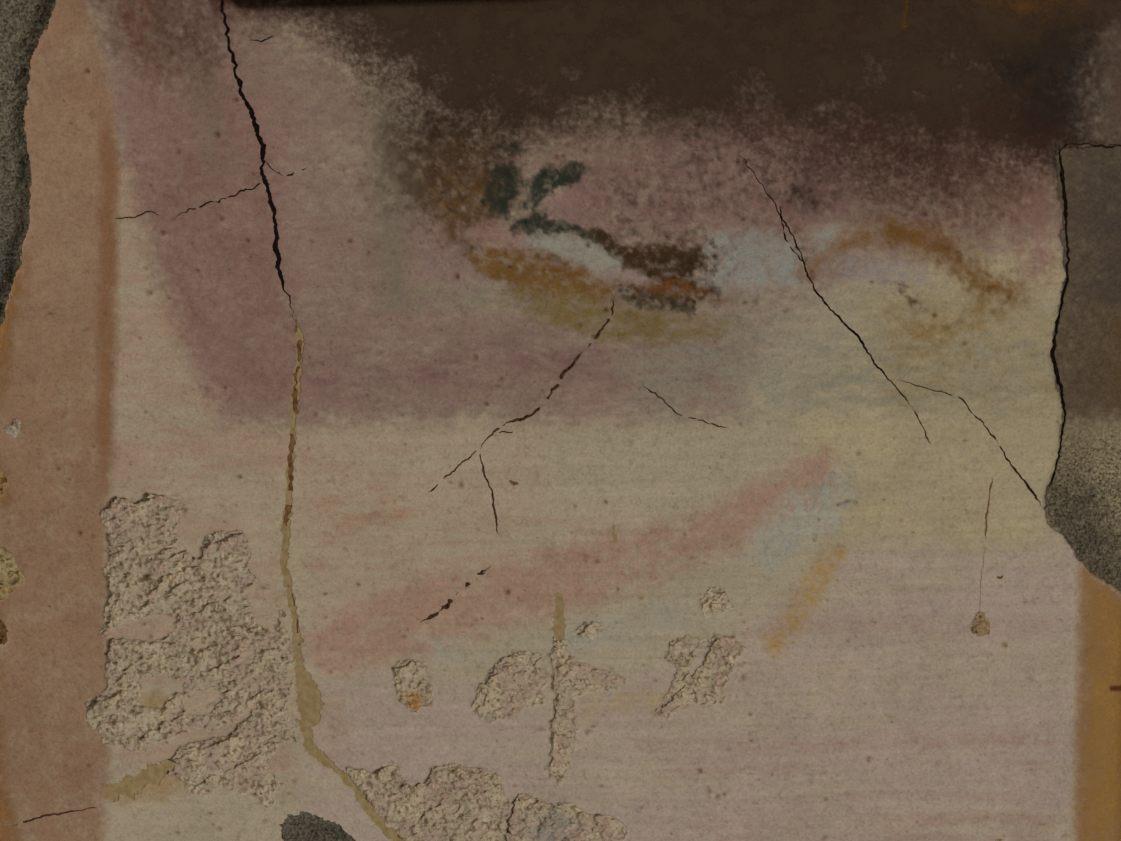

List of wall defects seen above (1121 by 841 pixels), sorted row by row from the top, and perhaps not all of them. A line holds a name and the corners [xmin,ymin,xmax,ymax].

crack [116,0,404,841]
crack [429,302,614,533]
crack [735,143,1121,613]
spalling [0,619,8,645]
spalling [0,548,25,601]
spalling [86,493,300,806]
spalling [393,659,434,713]
crack [422,567,490,621]
spalling [470,620,632,785]
spalling [653,635,746,721]
spalling [347,760,628,841]